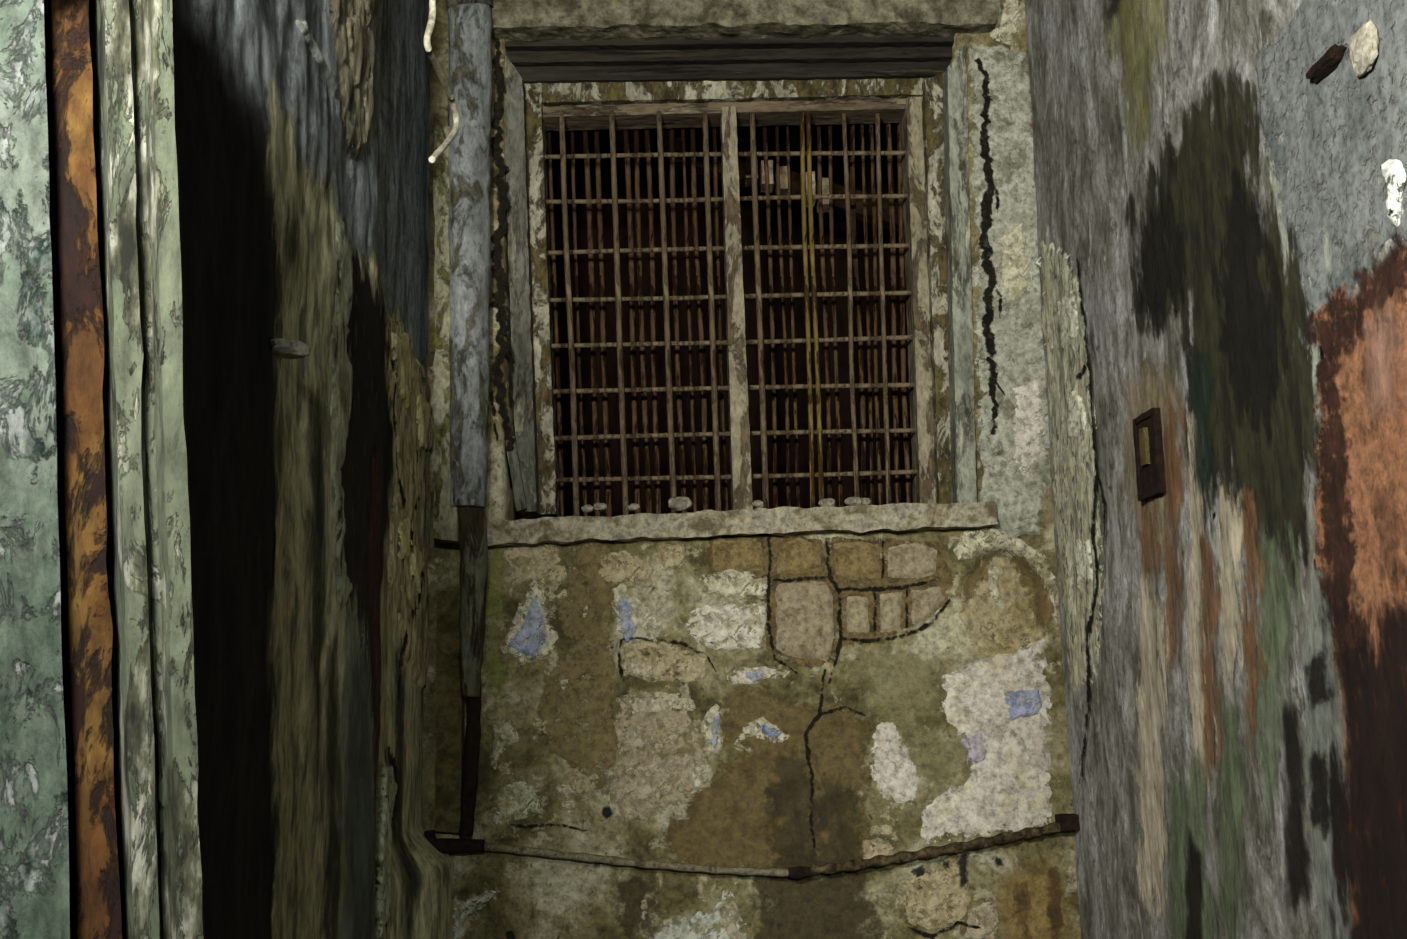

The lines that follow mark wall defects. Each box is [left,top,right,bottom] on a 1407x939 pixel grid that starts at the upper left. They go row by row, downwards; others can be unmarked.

corrosion [44,0,122,939]
flaking render [641,882,747,939]
flaking render [492,0,1105,848]
crack [718,499,950,848]
flaking render [862,839,895,859]
flaking render [901,861,1000,939]
crack [974,58,1005,434]
corrosion [1307,233,1407,939]